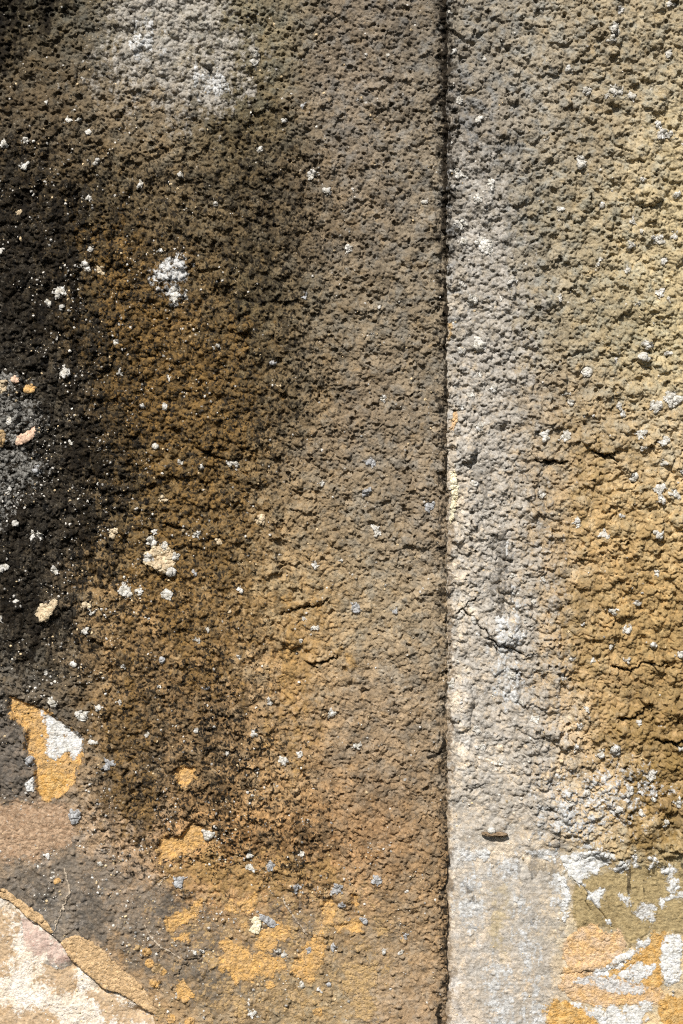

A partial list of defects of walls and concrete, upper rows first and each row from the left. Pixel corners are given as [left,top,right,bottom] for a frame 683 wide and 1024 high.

leakage [0,0,366,909]
crack [426,0,532,1024]
flaking render [0,696,122,866]
flaking render [0,823,409,1024]
peeling [525,847,683,1024]